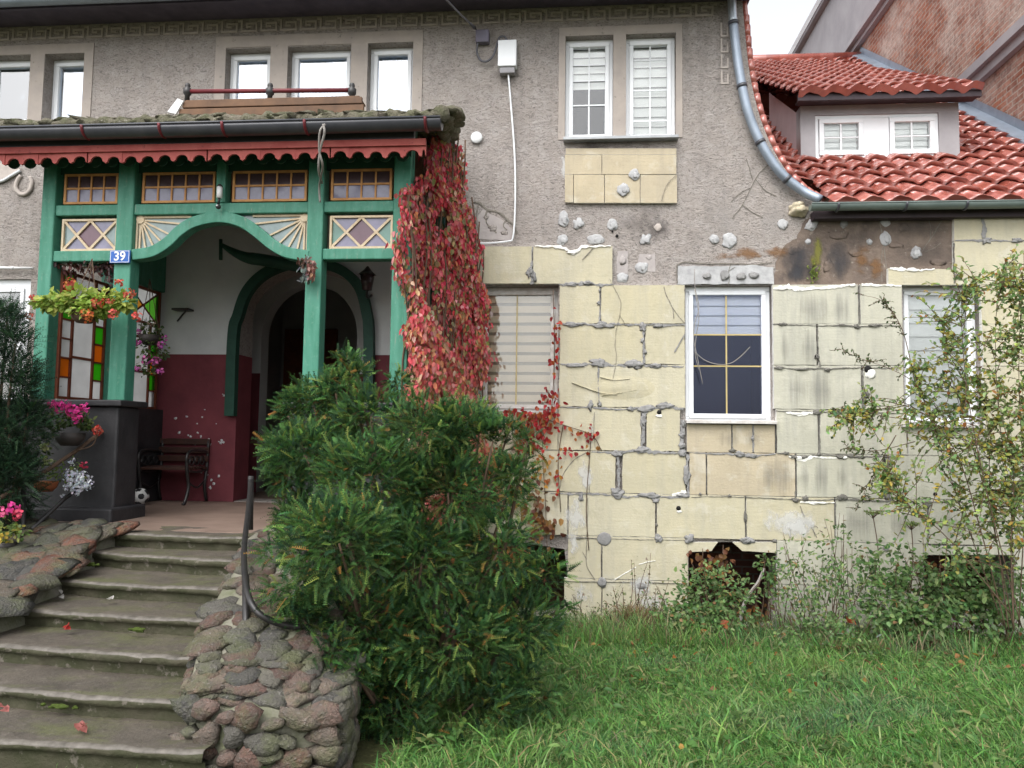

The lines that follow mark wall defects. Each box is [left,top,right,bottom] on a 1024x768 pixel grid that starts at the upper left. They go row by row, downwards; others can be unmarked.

spalling [525,245,611,284]
spalling [550,280,937,540]
crack [731,158,776,219]
peeling [773,218,1024,414]